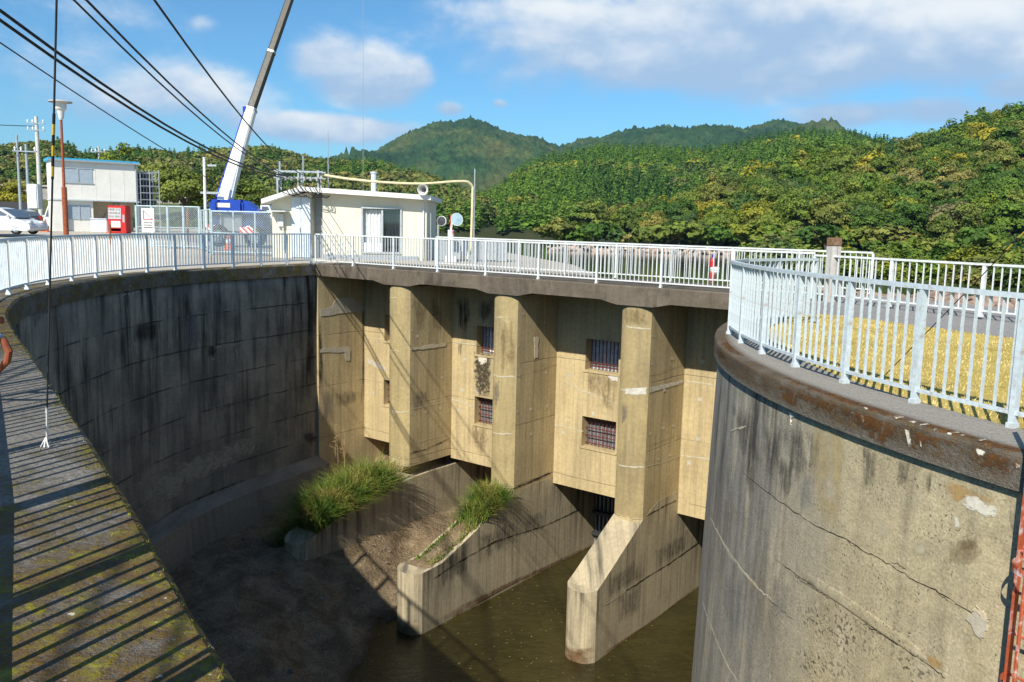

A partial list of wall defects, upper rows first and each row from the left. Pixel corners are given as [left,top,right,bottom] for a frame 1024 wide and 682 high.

water stain [307,302,322,383]
corrosion [779,377,1024,473]
crack [748,477,972,613]
crack [860,622,946,679]
spalling [966,605,989,639]